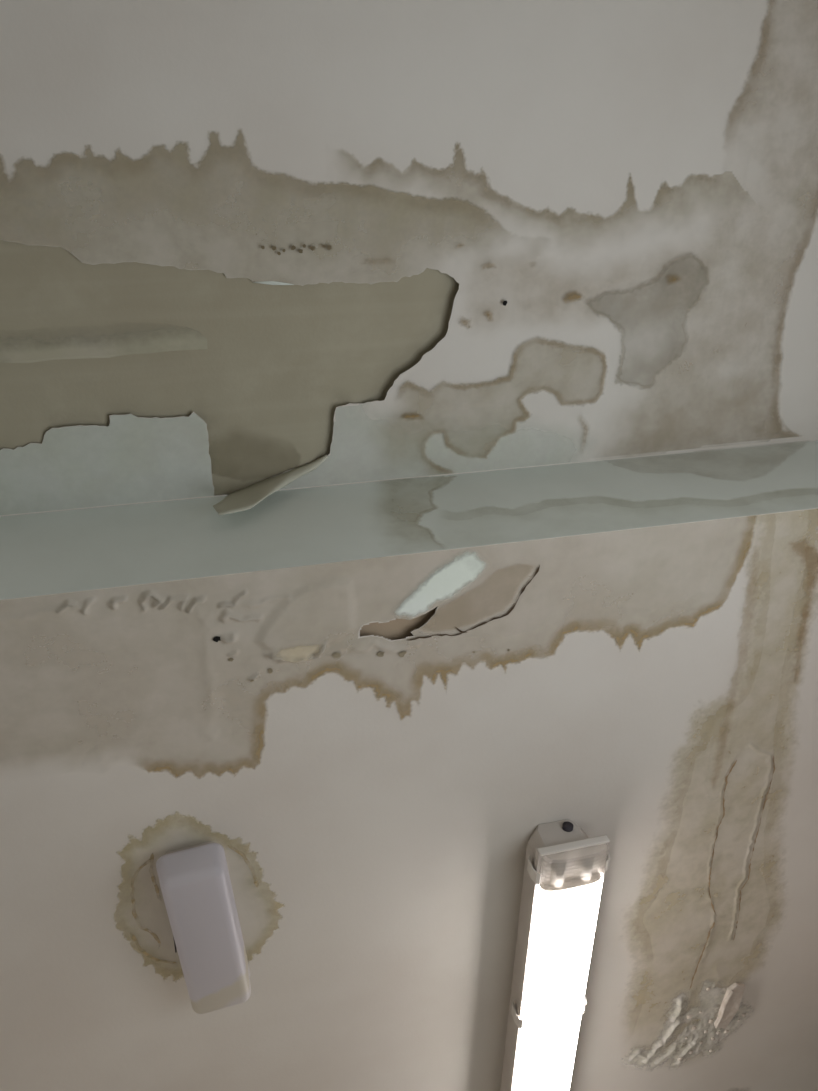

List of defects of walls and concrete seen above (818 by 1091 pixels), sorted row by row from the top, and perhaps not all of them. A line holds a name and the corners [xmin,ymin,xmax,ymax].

leakage [0,132,490,270]
leakage [624,183,635,206]
peeling [0,239,459,515]
peeling [360,553,485,640]
leakage [616,629,664,649]
flaking render [623,981,752,1069]